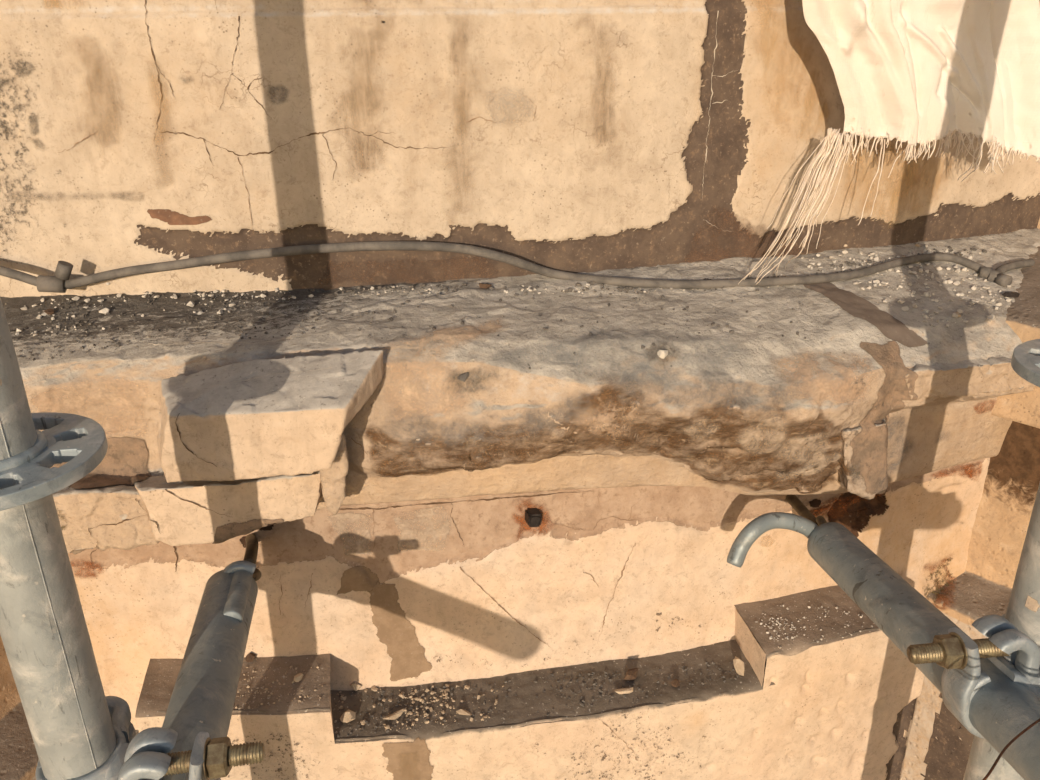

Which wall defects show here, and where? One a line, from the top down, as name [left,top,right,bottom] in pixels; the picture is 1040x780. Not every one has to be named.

water stain [0,60,37,235]
crack [144,0,449,221]
flaking render [134,0,1040,290]
crack [702,11,738,195]
crack [88,499,178,572]
peeling [340,709,356,723]
peeling [383,709,405,720]
water stain [337,566,456,681]
water stain [382,737,434,780]
crack [339,491,644,651]
peeling [613,668,639,694]
peeling [733,656,744,676]